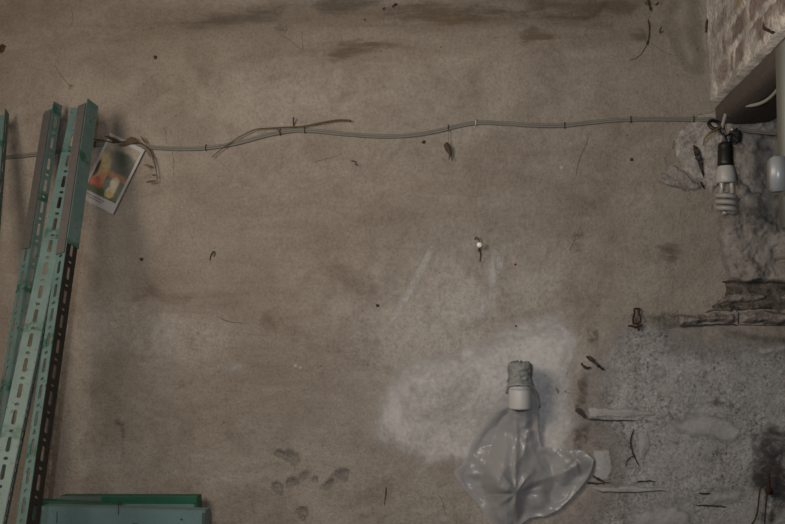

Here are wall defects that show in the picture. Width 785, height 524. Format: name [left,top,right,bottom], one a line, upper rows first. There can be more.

flaking render [661,110,724,193]
flaking render [678,282,785,326]
spalling [581,326,785,524]
damp [752,427,785,507]